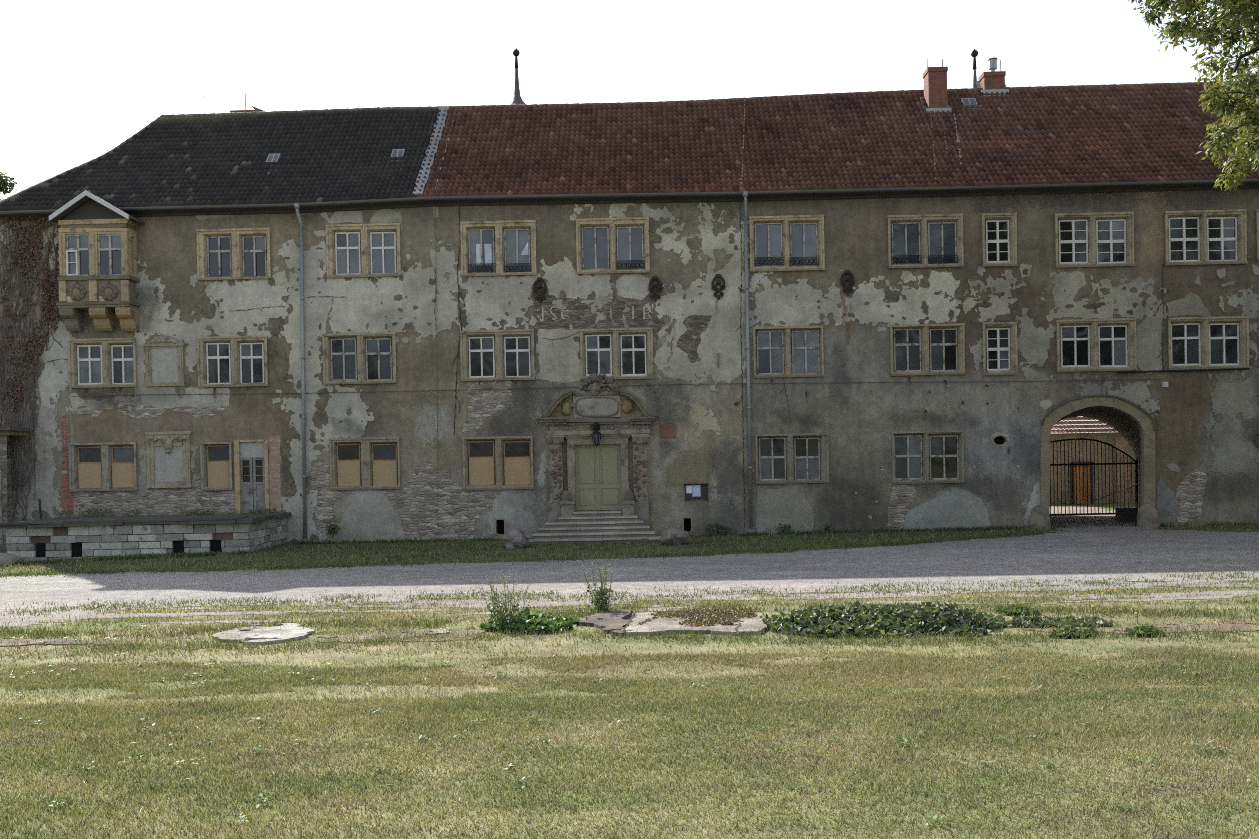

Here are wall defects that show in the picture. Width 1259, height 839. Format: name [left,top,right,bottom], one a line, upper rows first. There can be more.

peeling [0,202,1259,542]